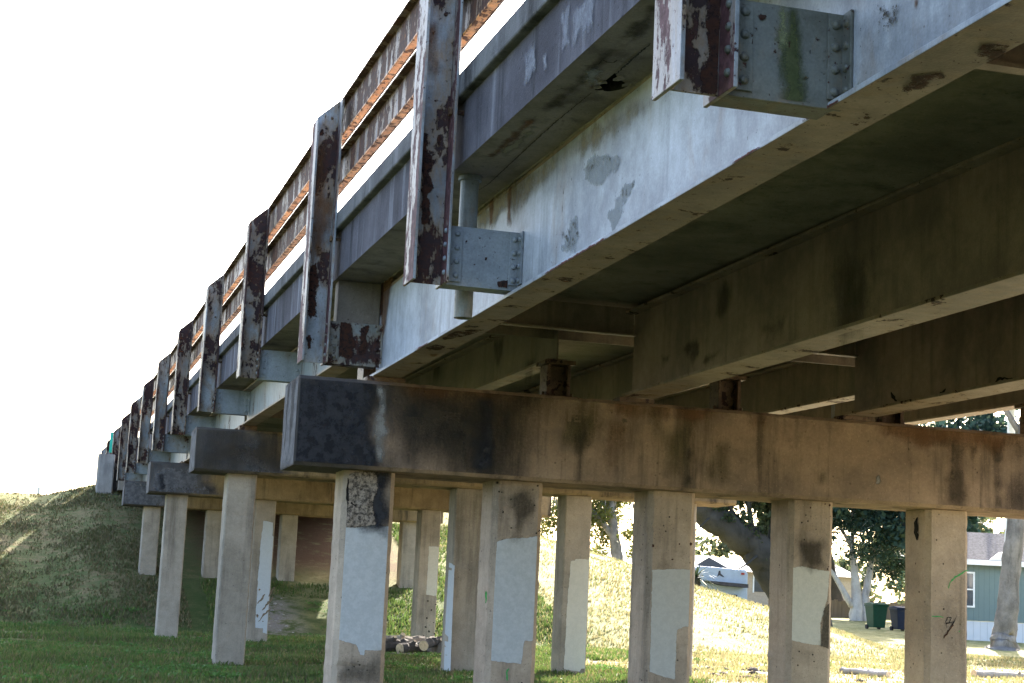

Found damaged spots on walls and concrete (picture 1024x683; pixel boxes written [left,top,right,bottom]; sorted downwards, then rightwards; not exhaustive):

rust [700,0,720,94]
spalling [586,69,632,94]
rust [420,133,442,225]
rust [308,155,333,318]
rust [339,322,369,359]
damp [121,376,540,531]
spalling [346,471,378,528]
damp [948,442,974,506]
damp [801,543,829,570]